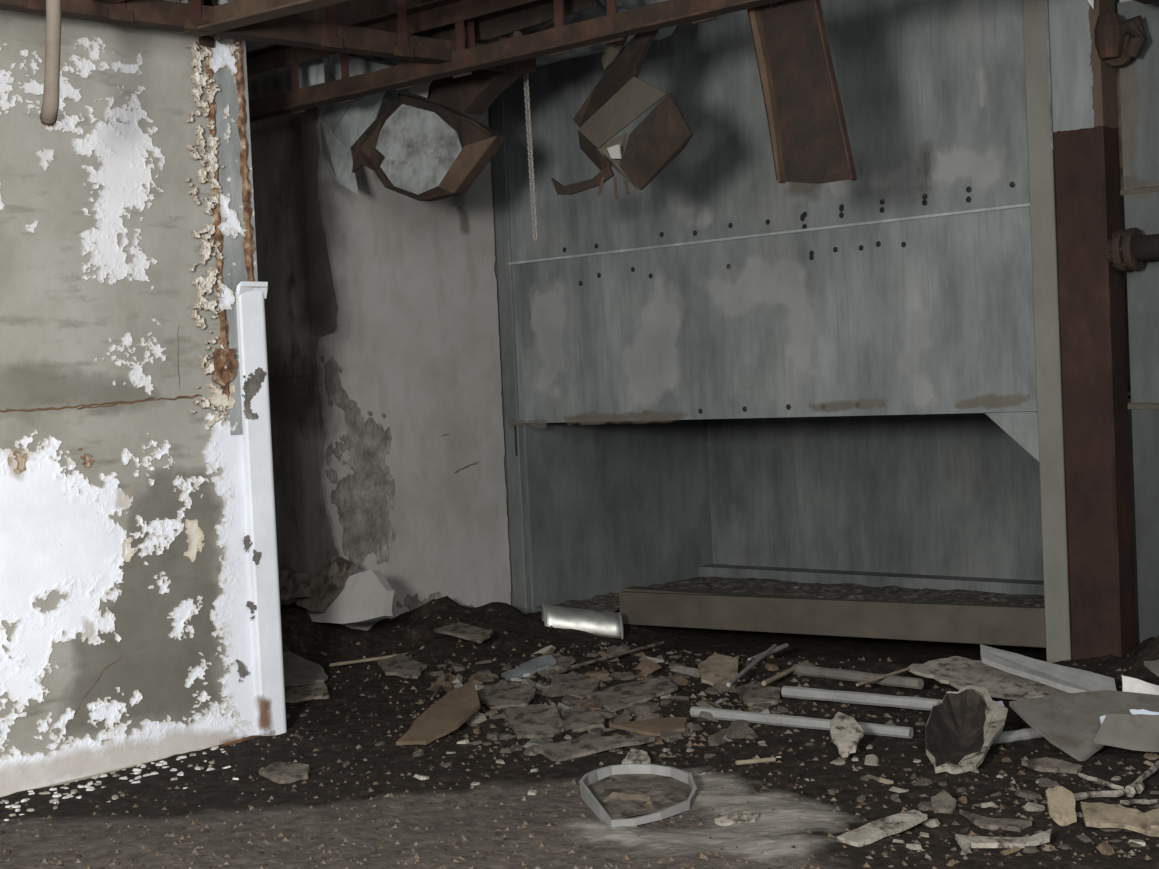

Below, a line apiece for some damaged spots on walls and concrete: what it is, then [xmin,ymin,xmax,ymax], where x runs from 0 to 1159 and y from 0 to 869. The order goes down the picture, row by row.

corrosion [204,46,229,348]
corrosion [233,39,255,282]
crack [0,325,202,413]
peeling [0,36,267,797]
flaking render [321,356,395,569]